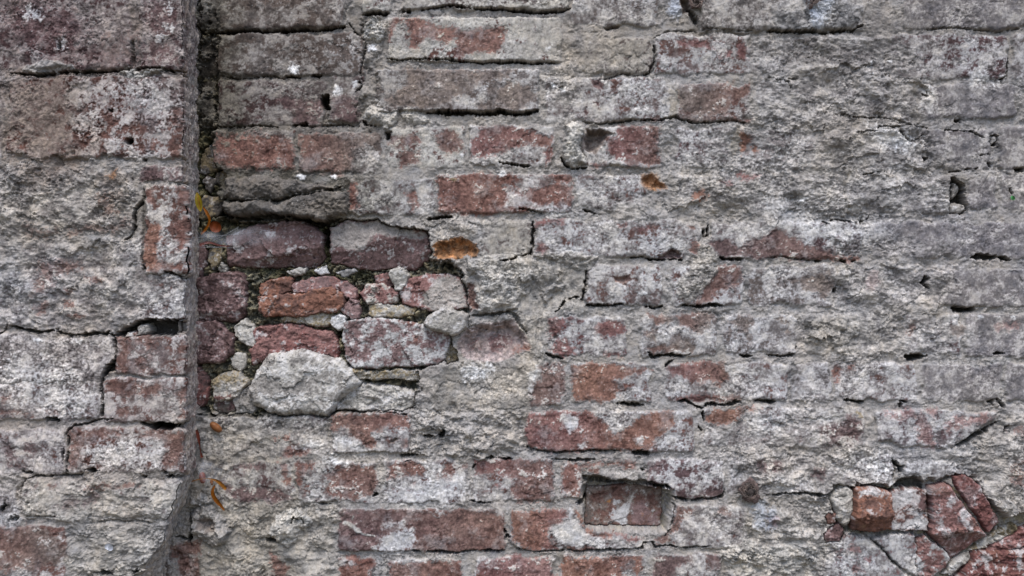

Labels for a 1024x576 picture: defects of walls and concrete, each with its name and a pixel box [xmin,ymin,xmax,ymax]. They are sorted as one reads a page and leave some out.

crack [499,221,536,262]
peeling [27,15,862,576]
crack [555,270,589,313]
peeling [1004,455,1024,491]
spalling [809,464,1024,576]